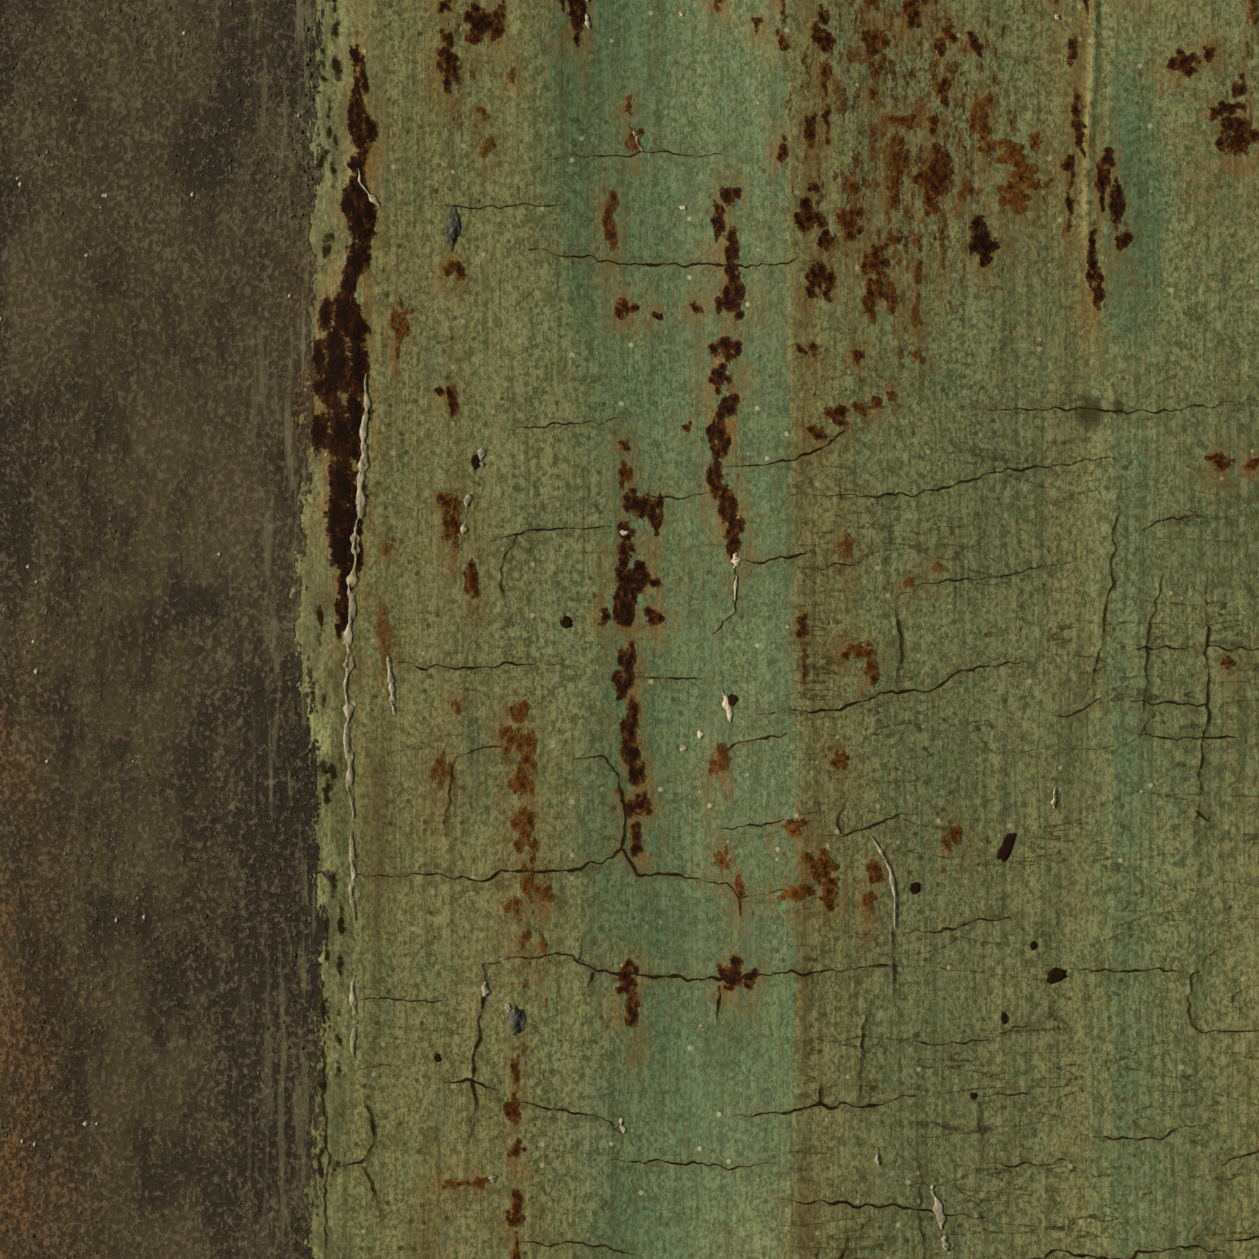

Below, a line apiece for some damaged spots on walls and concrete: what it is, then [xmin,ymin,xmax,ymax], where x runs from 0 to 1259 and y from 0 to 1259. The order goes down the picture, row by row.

rust [307,44,377,641]
rust [435,0,505,94]
rust [793,179,922,329]
rust [968,91,1132,310]
rust [1208,72,1259,156]
crack [725,561,1072,751]
crack [789,457,1259,838]
rust [498,699,554,955]
crack [357,745,788,916]
crack [441,916,1026,1144]
crack [775,1154,984,1259]
crack [999,1236,1259,1259]